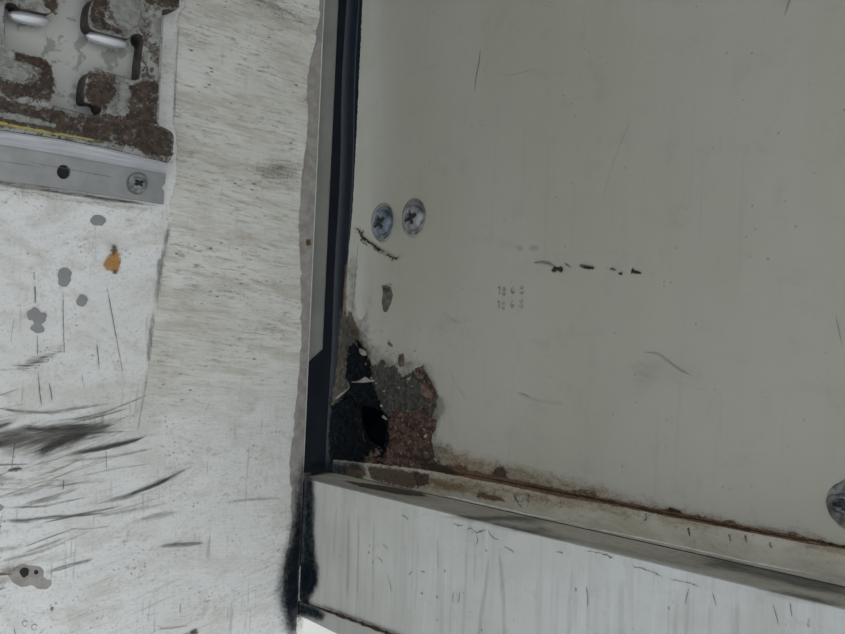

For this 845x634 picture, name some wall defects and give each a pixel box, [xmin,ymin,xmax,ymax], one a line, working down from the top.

rust [43,0,59,15]
rust [89,0,122,34]
rust [145,0,180,8]
rust [0,52,174,158]
rust [103,244,121,274]
peeling [381,284,393,312]
rust [331,265,359,405]
peeling [335,339,404,399]
rust [345,356,840,553]
peeling [0,564,51,589]